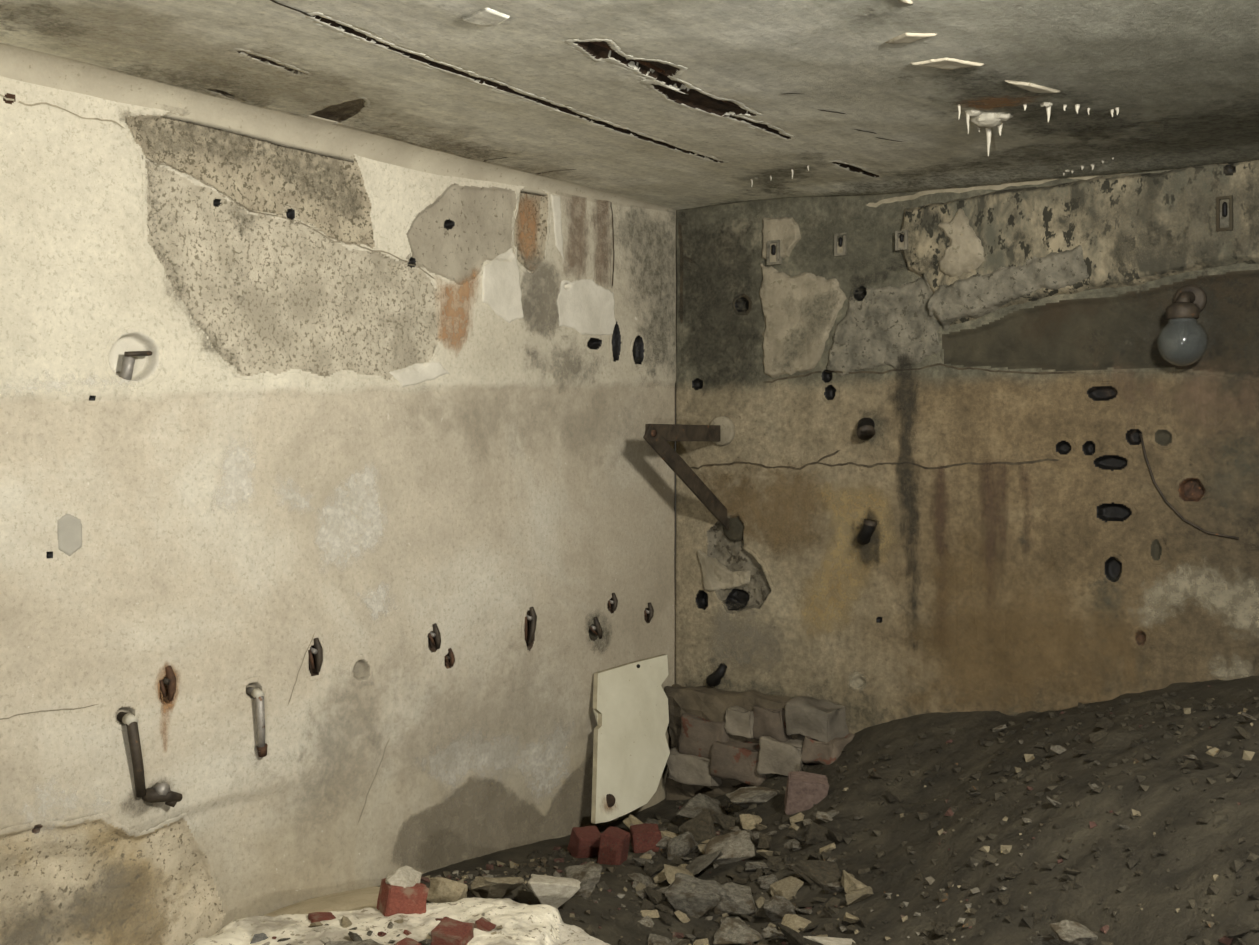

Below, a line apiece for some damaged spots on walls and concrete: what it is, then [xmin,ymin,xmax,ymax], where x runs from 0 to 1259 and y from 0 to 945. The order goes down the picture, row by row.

crack [270,0,312,17]
peeling [462,8,510,26]
spalling [301,12,729,164]
spalling [565,39,796,140]
leakage [825,69,1259,270]
flaking render [121,108,564,387]
peeling [556,279,616,335]
peeling [759,160,1259,382]
crack [690,450,1058,470]
rust [158,664,178,744]
flaking render [0,813,228,945]